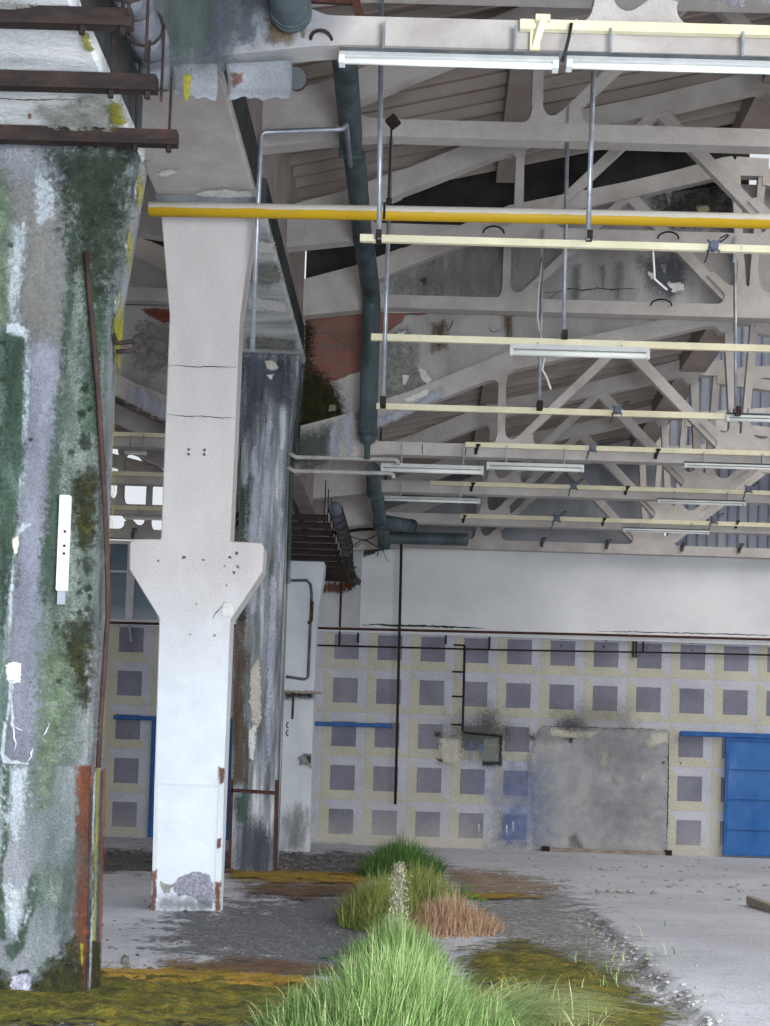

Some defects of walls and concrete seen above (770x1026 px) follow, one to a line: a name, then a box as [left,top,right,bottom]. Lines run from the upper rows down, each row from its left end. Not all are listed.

leakage [0,146,145,849]
leakage [239,320,359,562]
leakage [248,576,278,772]
efflorescence [1,883,34,940]
corrosion [60,765,106,990]
spalling [160,872,215,910]